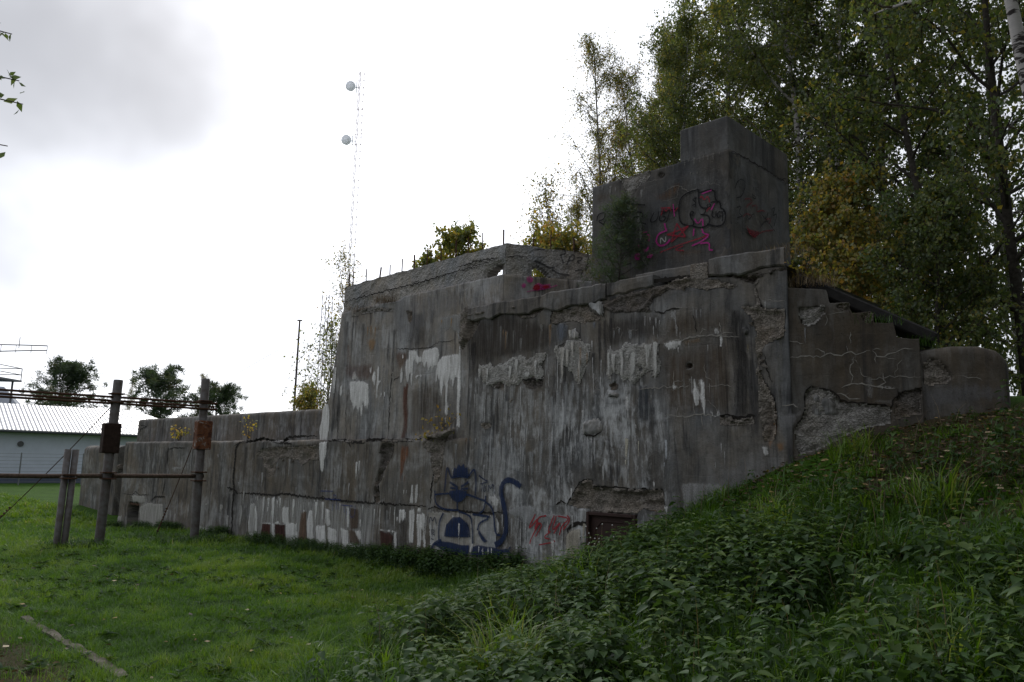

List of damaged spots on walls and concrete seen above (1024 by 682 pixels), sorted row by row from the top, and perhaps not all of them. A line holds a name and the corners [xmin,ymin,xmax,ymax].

crack [227,339,501,534]
water stain [400,290,681,561]
spalling [588,286,671,318]
spalling [729,267,787,441]
crack [764,311,922,426]
spalling [794,386,892,455]
spalling [568,479,665,513]